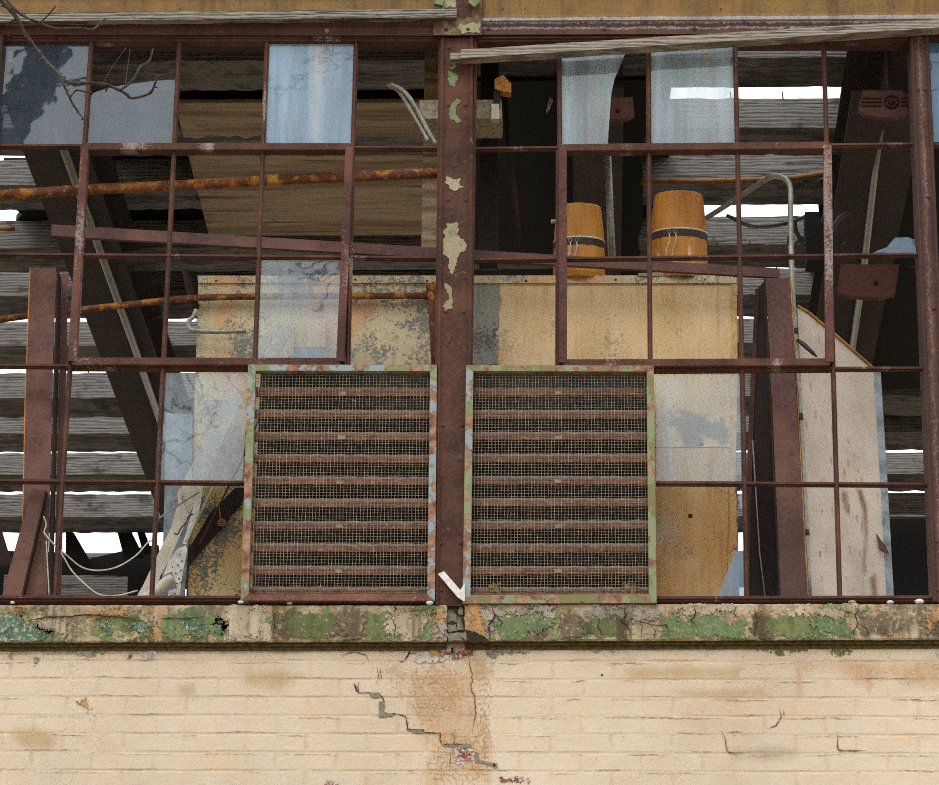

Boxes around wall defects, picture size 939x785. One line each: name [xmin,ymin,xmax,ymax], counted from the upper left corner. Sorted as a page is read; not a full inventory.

peeling [434,0,481,34]
peeling [448,63,458,87]
peeling [449,99,461,123]
peeling [445,175,464,191]
peeling [443,222,467,310]
peeling [0,606,74,659]
spalling [122,604,337,641]
peeling [362,604,565,664]
peeling [580,603,860,657]
peeling [125,651,157,660]
crack [1,607,939,774]